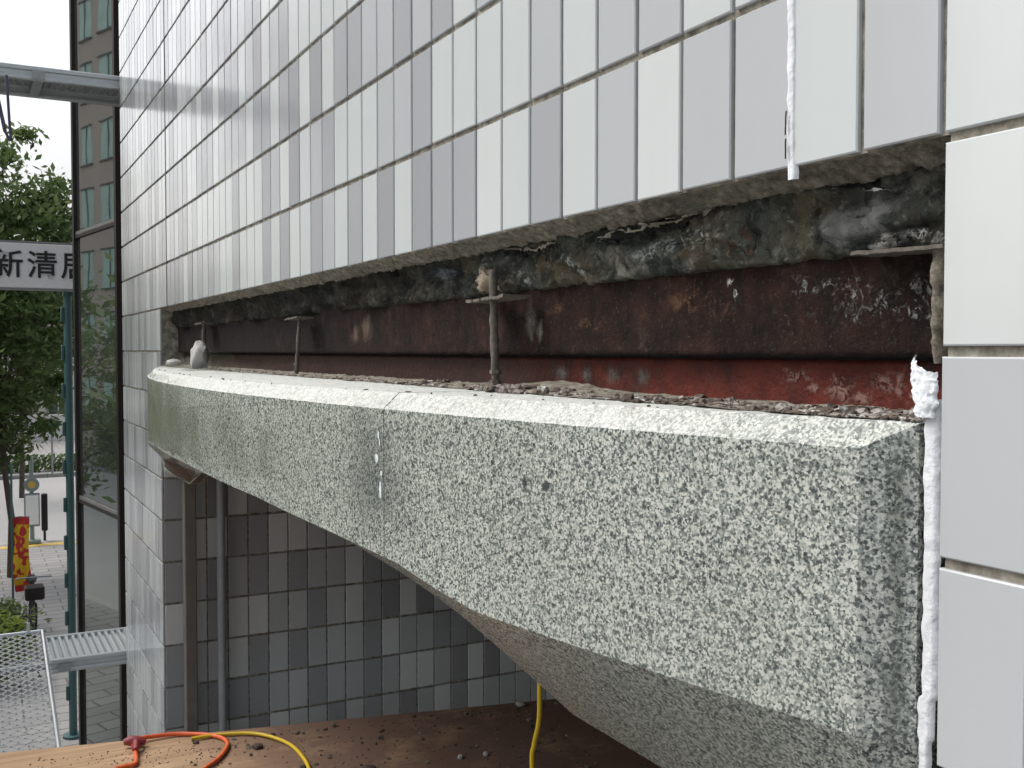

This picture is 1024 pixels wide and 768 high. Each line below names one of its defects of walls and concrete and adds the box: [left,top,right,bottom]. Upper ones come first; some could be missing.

spalling [823,201,890,240]
spalling [475,269,507,295]
leakage [796,278,932,325]
peeling [785,369,913,404]